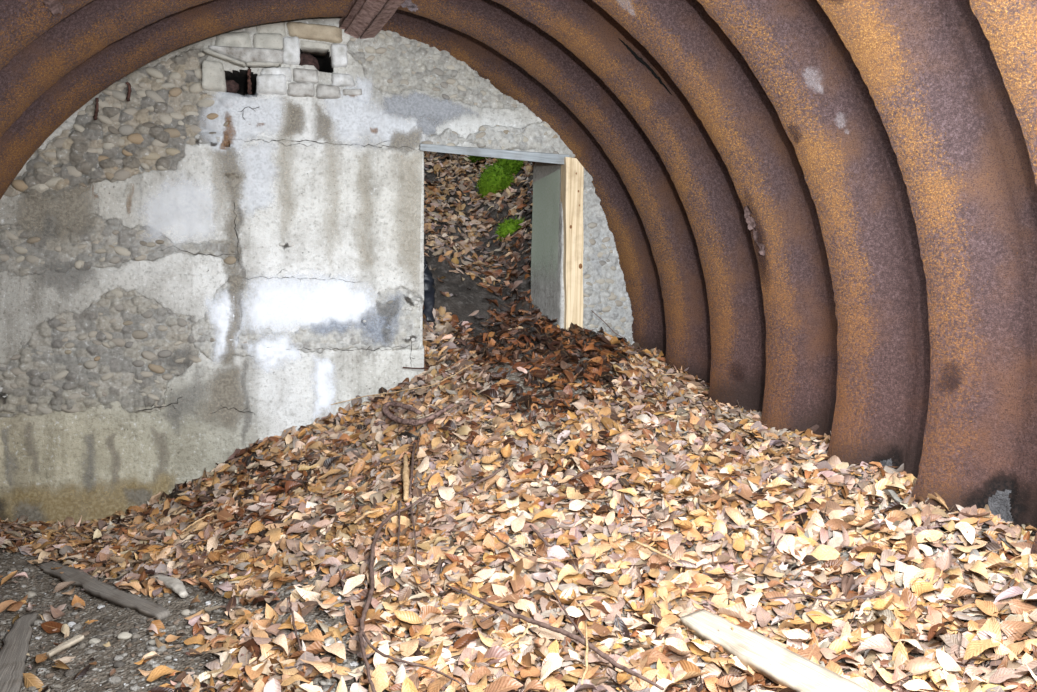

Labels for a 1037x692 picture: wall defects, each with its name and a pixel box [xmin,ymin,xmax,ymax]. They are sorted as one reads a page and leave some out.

rust [401,0,418,12]
rust [221,116,235,150]
water stain [318,80,423,268]
water stain [203,92,400,427]
rust [744,205,766,255]
water stain [0,430,173,525]